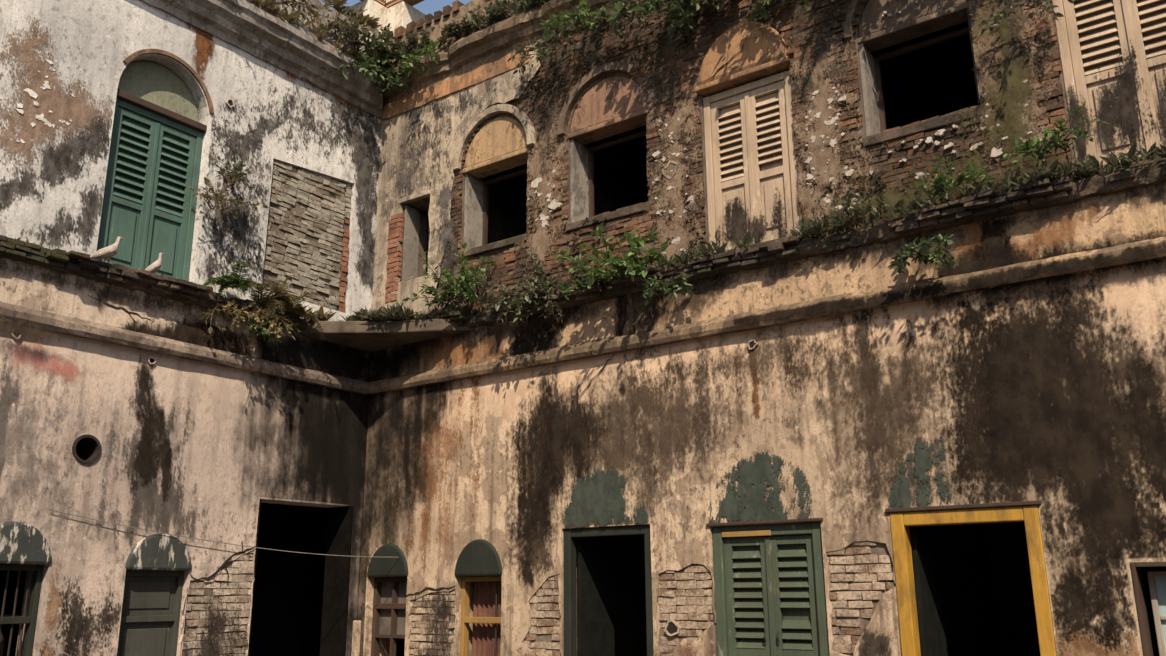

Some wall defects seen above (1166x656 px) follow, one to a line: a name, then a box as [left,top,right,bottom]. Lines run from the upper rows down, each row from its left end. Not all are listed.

flaking render [0,15,113,176]
crack [703,37,747,84]
water stain [197,64,500,291]
water stain [452,274,747,356]
water stain [87,358,208,546]
water stain [503,202,1166,656]
water stain [40,570,121,656]
flaking render [182,550,254,656]
crack [189,541,255,586]
flaking render [523,574,561,656]
flaking render [658,563,714,654]
flaking render [826,541,896,656]